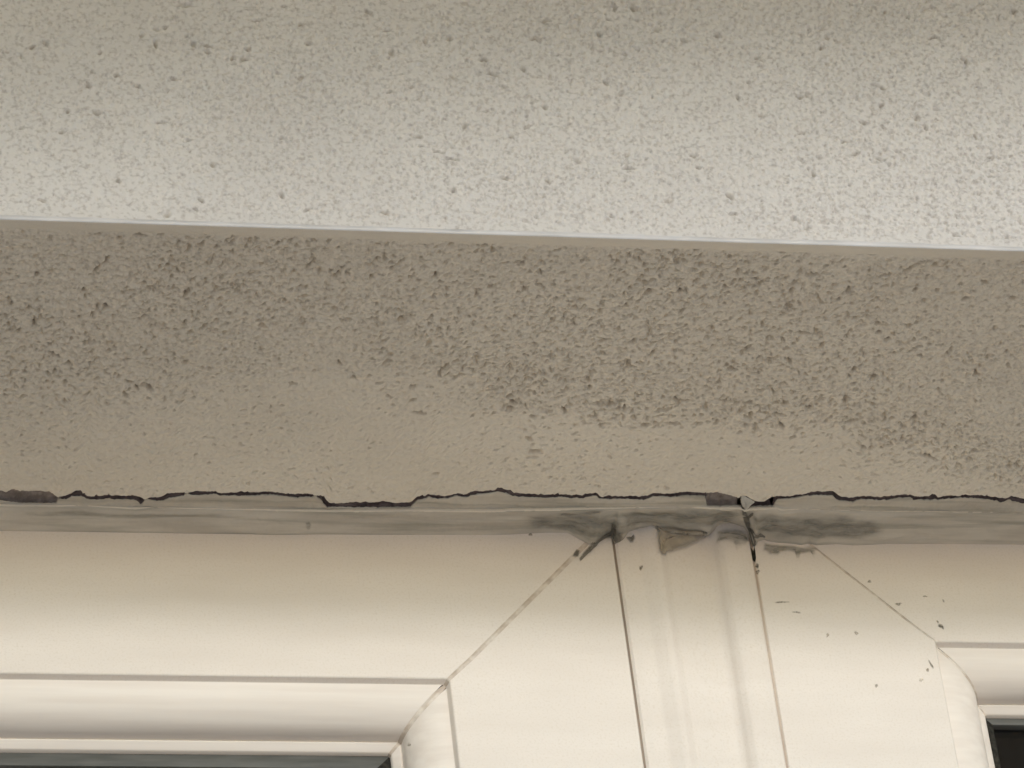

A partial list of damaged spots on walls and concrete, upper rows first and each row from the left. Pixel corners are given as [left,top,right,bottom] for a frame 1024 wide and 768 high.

crack [61,488,706,508]
flaking render [706,492,771,506]
water stain [631,513,875,554]